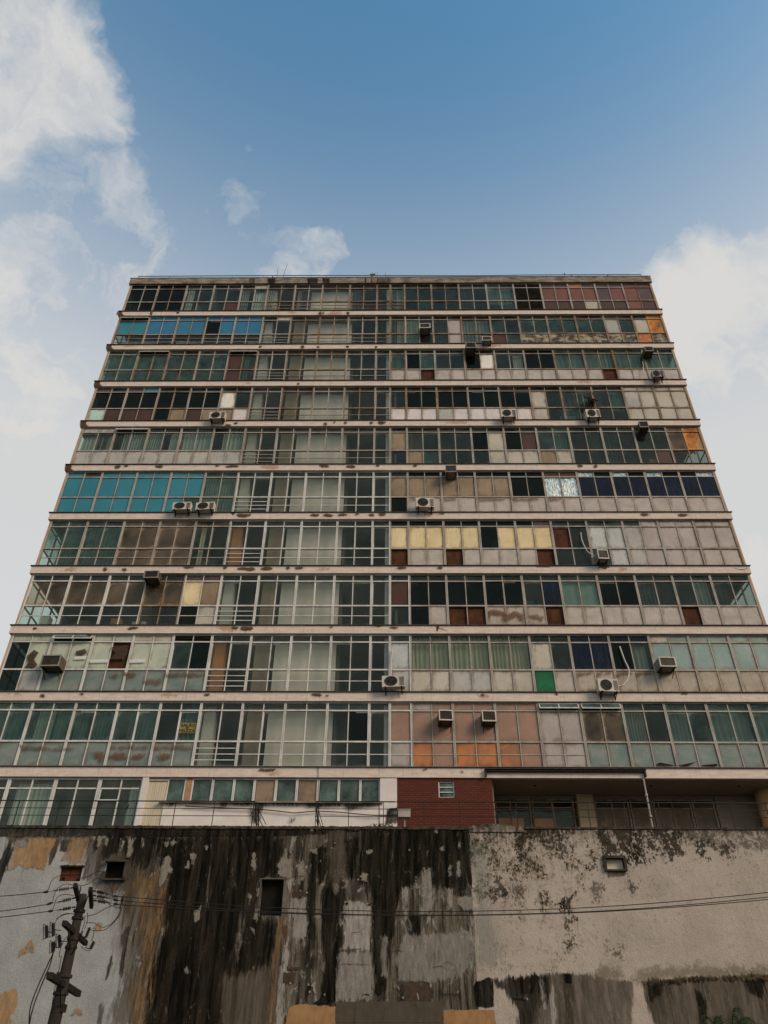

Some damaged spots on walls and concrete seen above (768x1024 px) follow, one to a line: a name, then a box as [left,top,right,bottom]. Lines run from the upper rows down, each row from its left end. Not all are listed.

corrosion [488,609,543,622]
corrosion [94,746,190,762]
peeling [8,836,144,870]
peeling [276,845,321,898]
leakage [0,803,713,1024]
peeling [0,988,18,1024]
spalling [283,967,299,984]
spalling [305,982,327,1007]
spalling [402,981,432,1001]
leakage [474,972,768,1024]